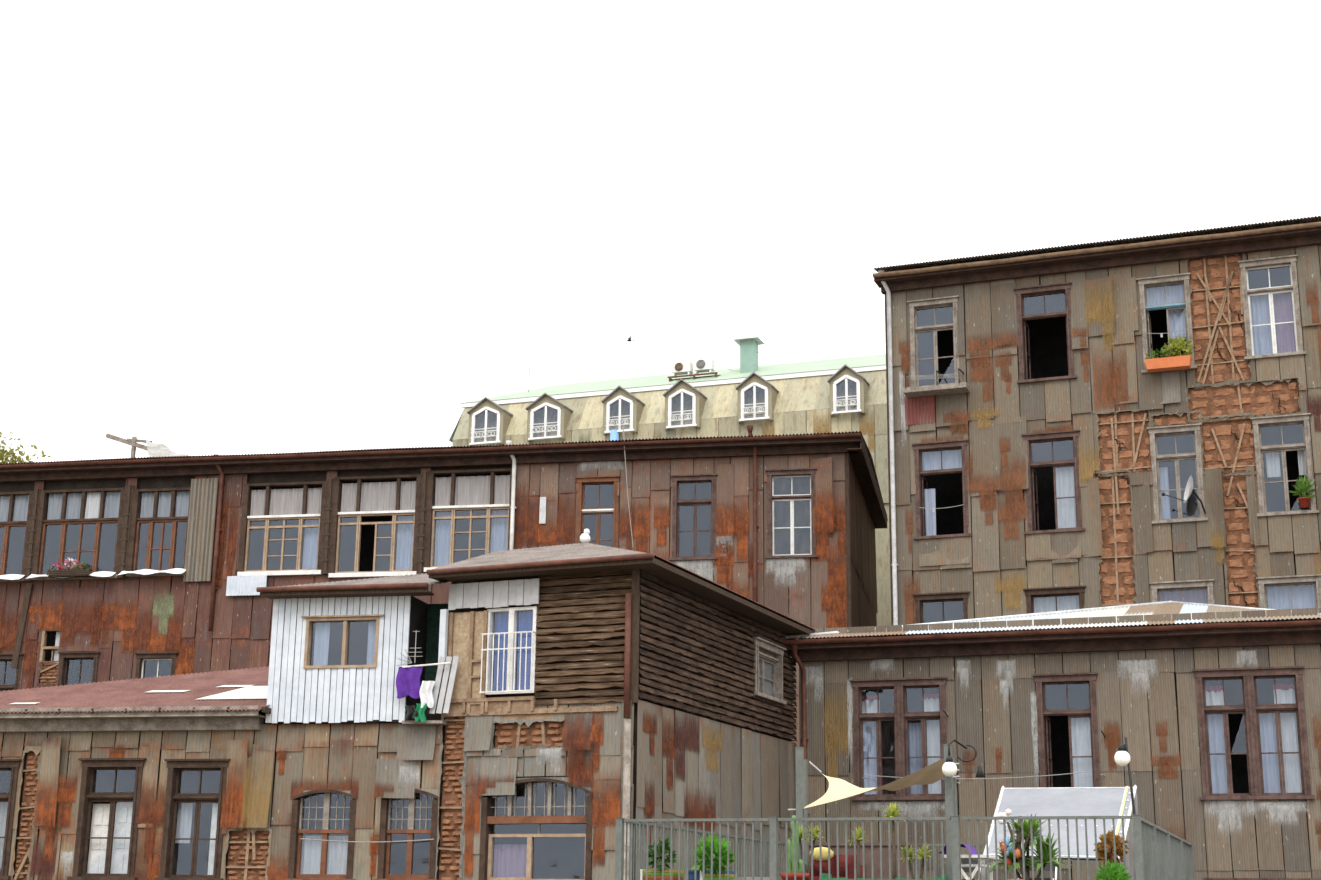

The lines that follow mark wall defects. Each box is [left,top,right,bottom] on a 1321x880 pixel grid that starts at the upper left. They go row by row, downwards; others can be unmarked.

corrosion [921,333,1018,443]
corrosion [1073,295,1128,409]
corrosion [1306,397,1321,432]
corrosion [967,440,1026,539]
corrosion [814,494,847,628]
corrosion [0,602,195,689]
damp [1120,659,1156,689]
corrosion [30,777,78,880]
corrosion [136,787,166,880]
corrosion [563,716,621,865]
corrosion [643,715,722,844]
corrosion [1151,724,1181,779]